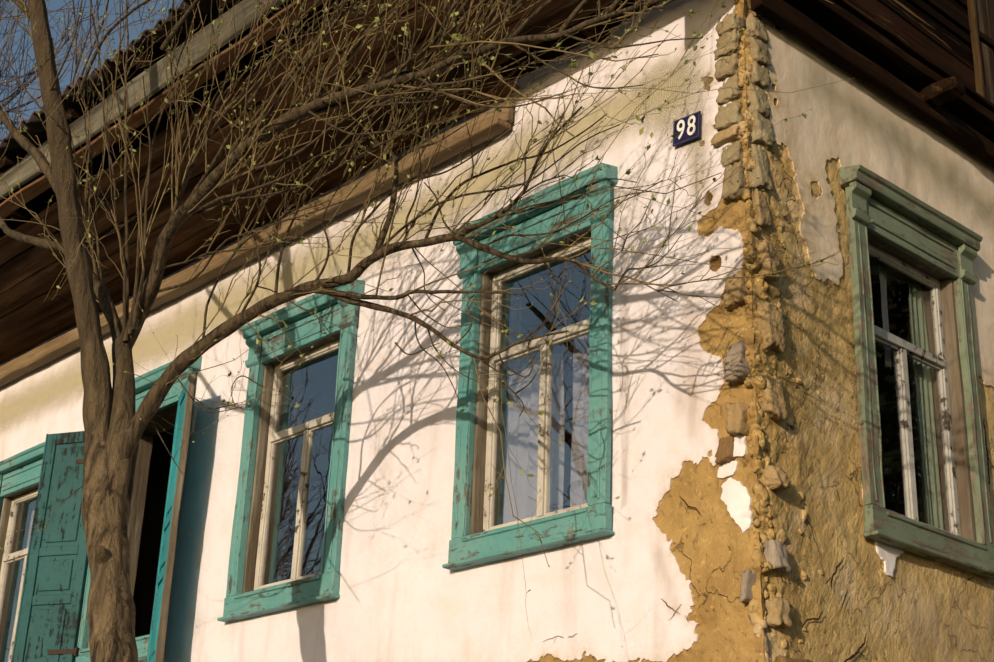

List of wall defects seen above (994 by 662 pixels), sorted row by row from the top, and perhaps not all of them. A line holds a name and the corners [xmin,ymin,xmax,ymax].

flaking render [629,0,994,662]
crack [981,406,994,515]
crack [802,516,848,628]
flaking render [529,652,615,662]
crack [844,635,866,662]